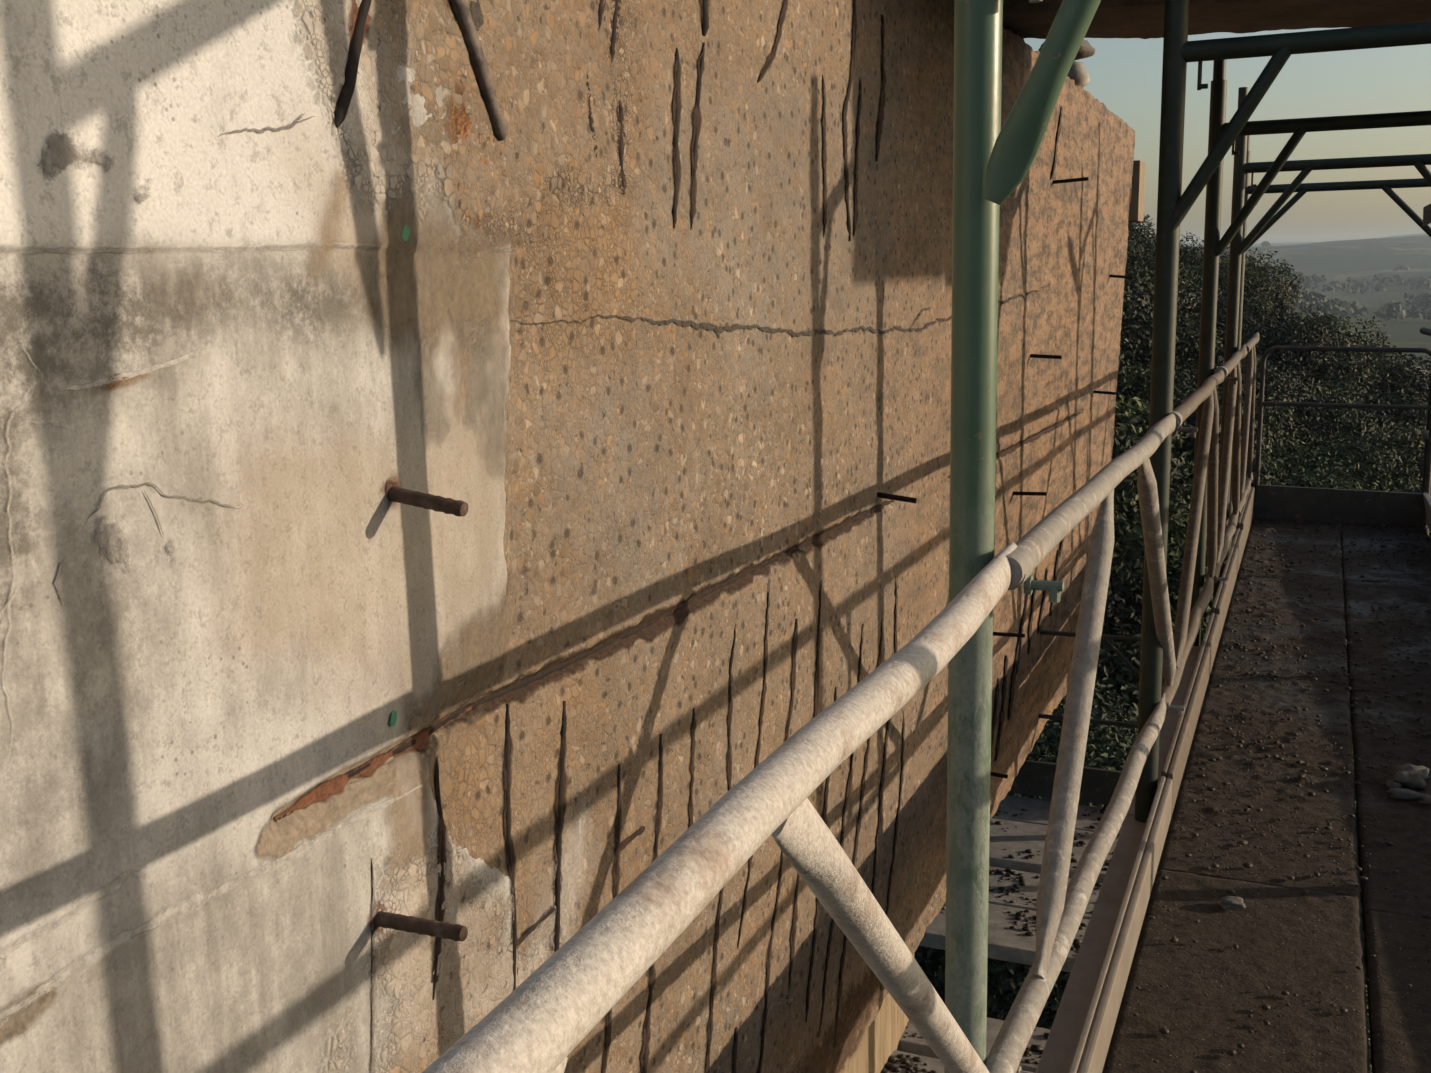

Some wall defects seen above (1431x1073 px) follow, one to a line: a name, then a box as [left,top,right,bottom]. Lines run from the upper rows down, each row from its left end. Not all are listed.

crack [218,112,315,137]
corrosion [451,87,495,164]
spalling [1001,27,1040,129]
damp [367,191,514,460]
crack [511,307,952,338]
crack [998,286,1047,304]
spalling [994,76,1135,557]
crack [83,482,239,536]
spalling [257,0,955,1073]
spalling [990,504,1100,820]
corrosion [275,707,472,820]
damp [391,579,511,860]